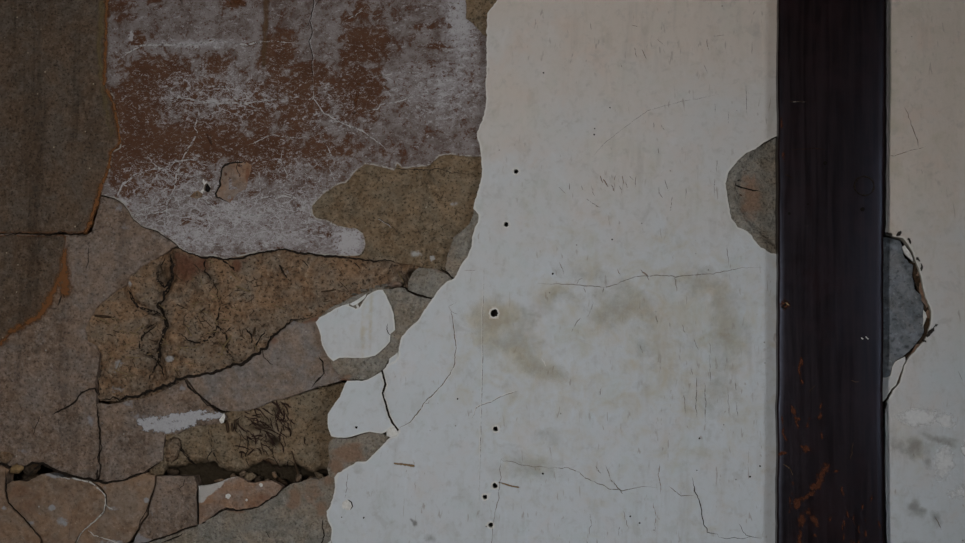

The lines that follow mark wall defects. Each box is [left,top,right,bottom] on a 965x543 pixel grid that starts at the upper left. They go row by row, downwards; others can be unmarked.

peeling [86,0,497,401]
spalling [725,138,776,254]
crack [0,0,457,543]
spalling [137,382,345,488]
crack [491,460,756,543]